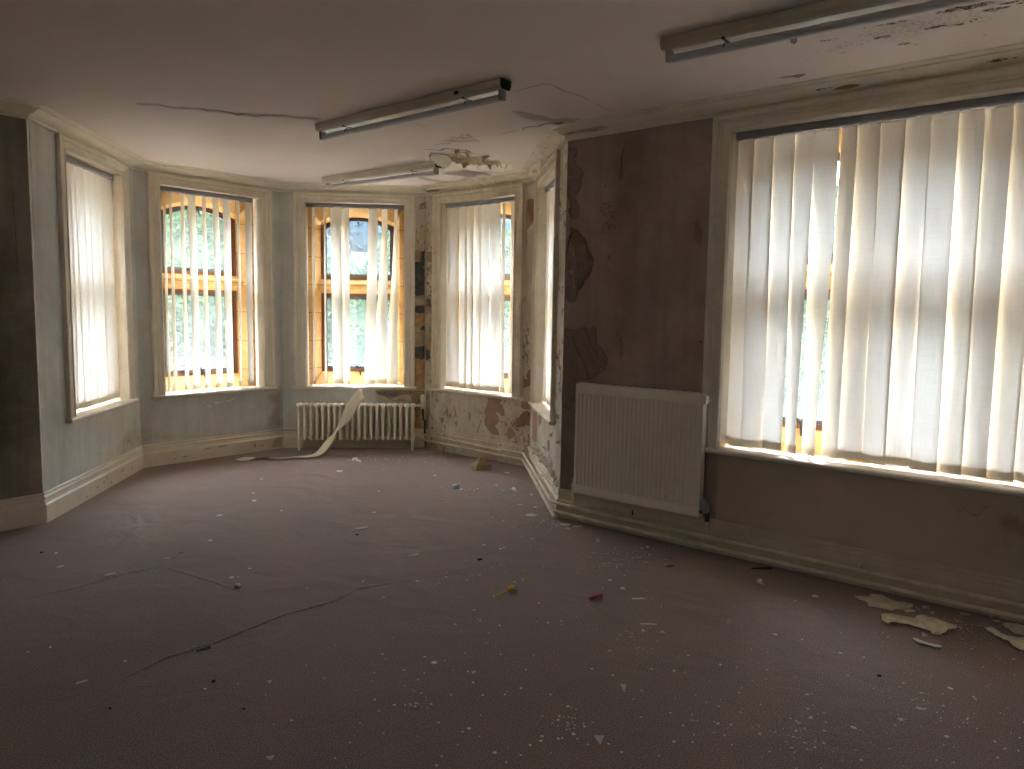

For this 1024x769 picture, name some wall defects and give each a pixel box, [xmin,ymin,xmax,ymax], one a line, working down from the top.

flaking render [426,148,513,172]
flaking render [476,327,562,489]